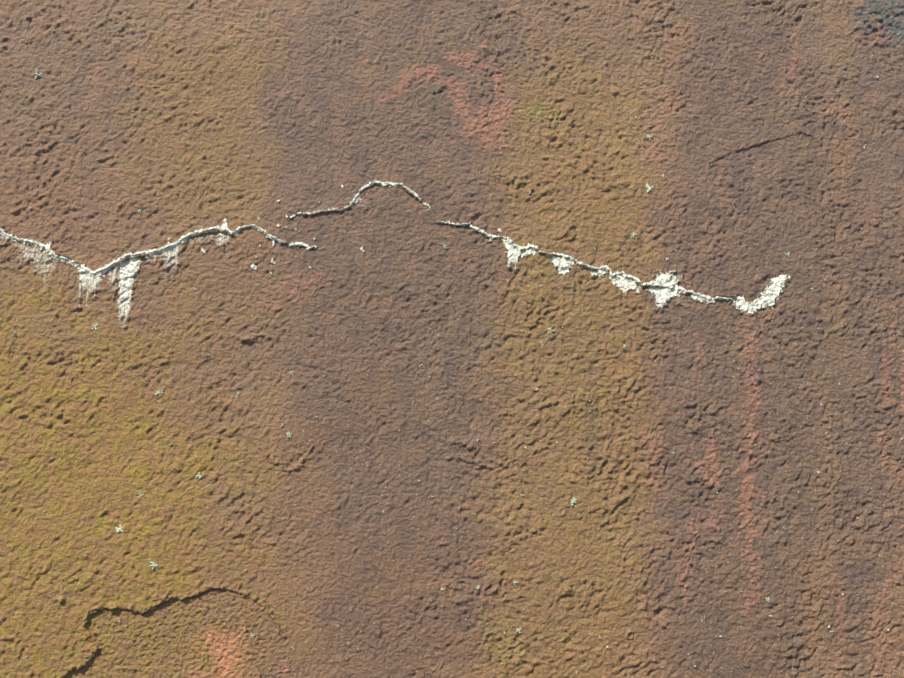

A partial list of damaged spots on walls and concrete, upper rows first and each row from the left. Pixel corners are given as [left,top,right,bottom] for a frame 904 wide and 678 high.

crack [0,179,791,334]
corrosion [673,301,787,623]
water stain [644,0,904,678]